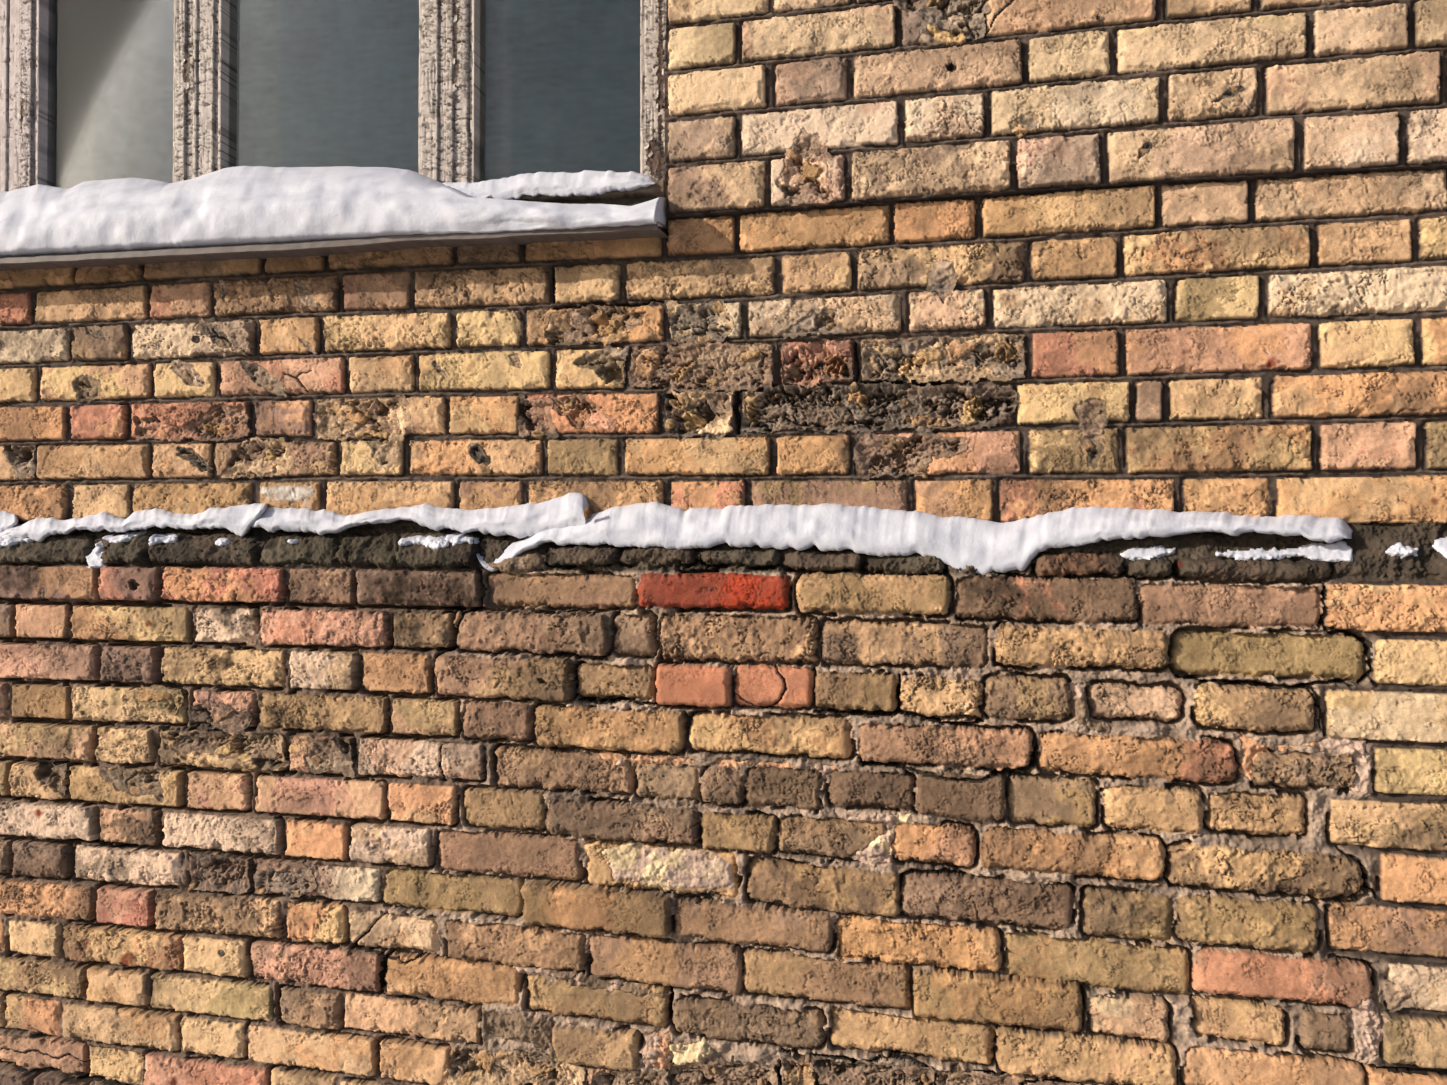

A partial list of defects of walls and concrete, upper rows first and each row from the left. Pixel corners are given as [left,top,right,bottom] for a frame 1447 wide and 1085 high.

spalling [894,0,991,46]
spalling [776,128,833,208]
spalling [545,299,1028,480]
spalling [517,394,617,440]
crack [737,664,787,708]
crack [814,674,984,725]
crack [857,738,1038,783]
spalling [447,1047,1081,1085]